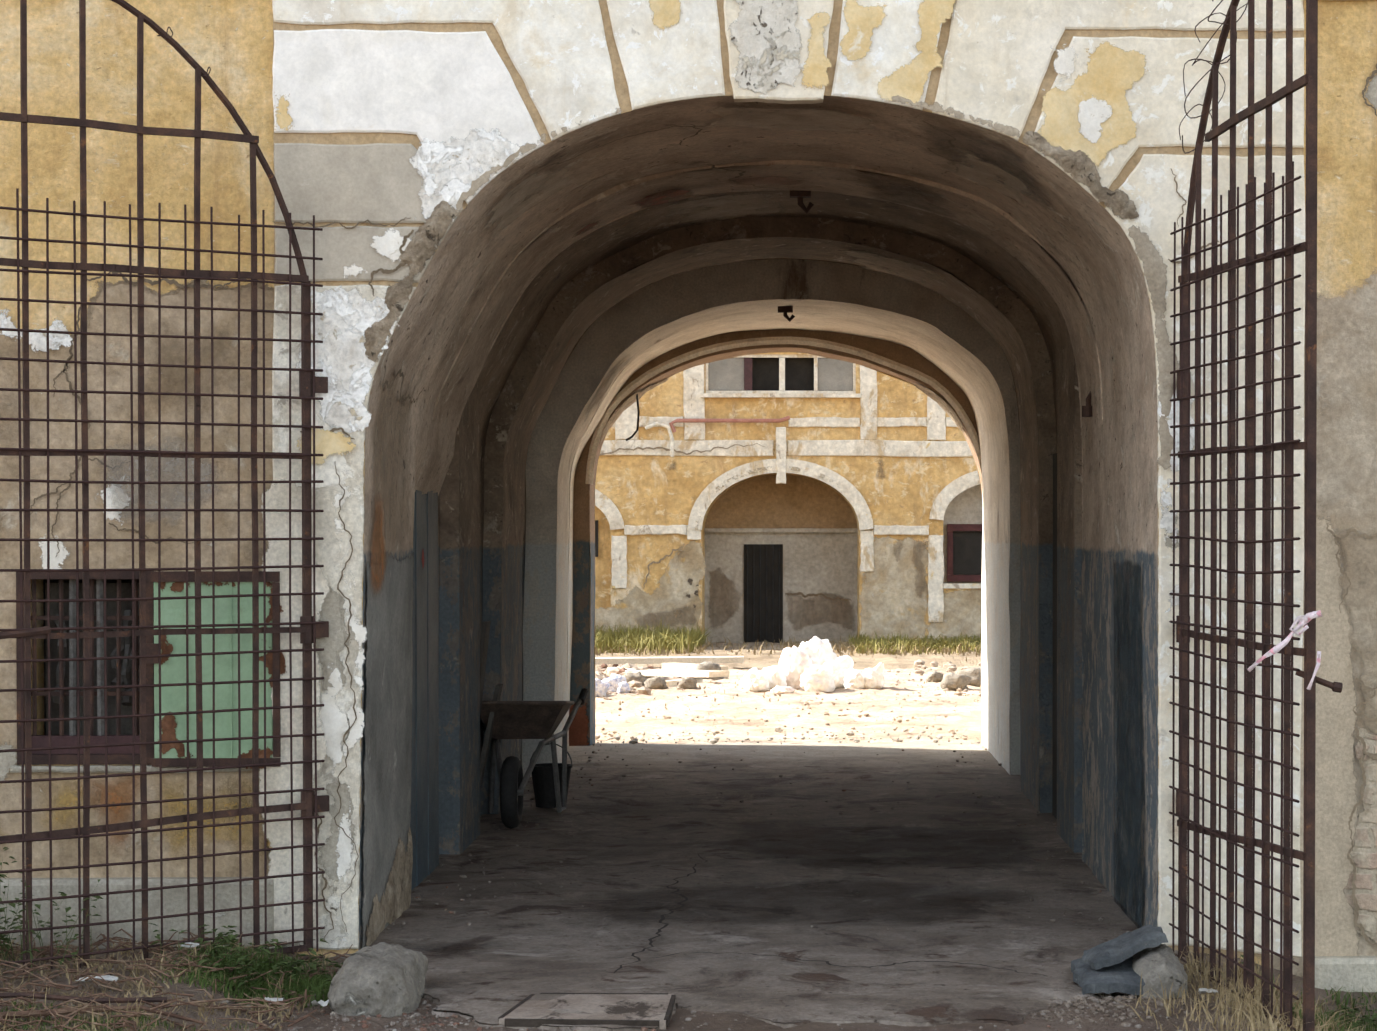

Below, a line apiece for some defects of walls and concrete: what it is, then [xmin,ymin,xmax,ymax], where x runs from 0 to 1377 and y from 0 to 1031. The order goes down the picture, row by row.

peeling [649,0,681,30]
spalling [727,0,887,94]
peeling [877,0,1020,137]
peeling [1037,41,1148,166]
peeling [409,115,595,223]
peeling [370,228,412,265]
peeling [296,263,399,548]
peeling [1304,274,1377,571]
peeling [0,280,367,945]
spalling [1344,643,1377,956]
spalling [366,821,413,946]
crack [613,853,1046,976]